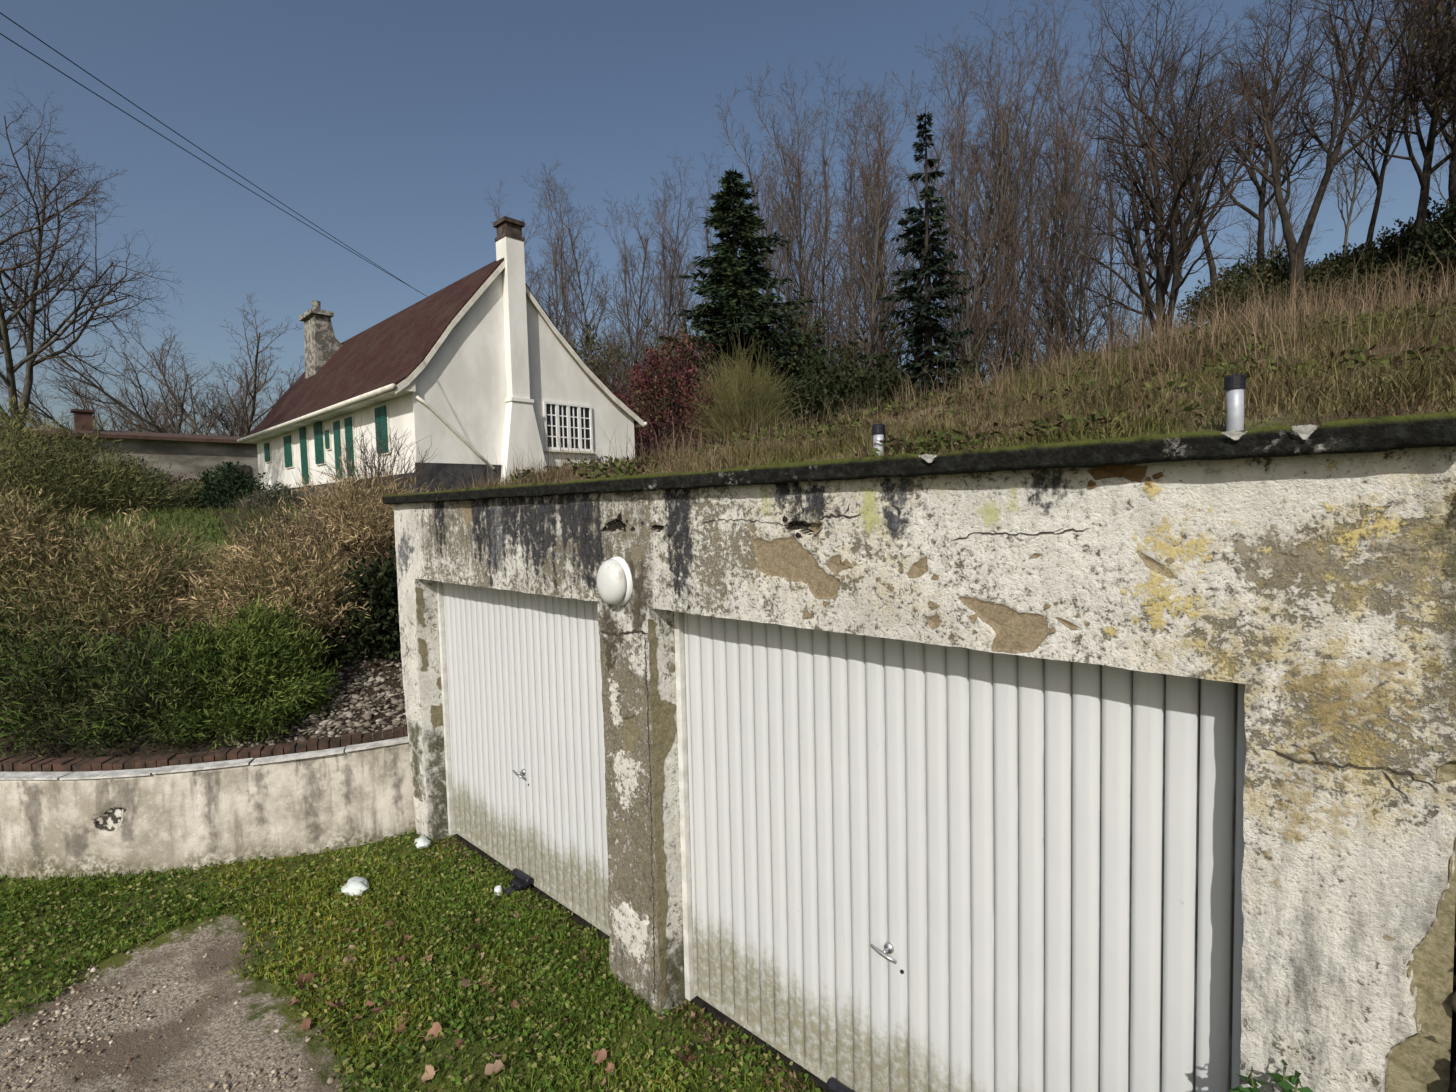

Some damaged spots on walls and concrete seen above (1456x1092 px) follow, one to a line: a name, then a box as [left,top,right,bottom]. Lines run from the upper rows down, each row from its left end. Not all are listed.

damp [471,493,652,669]
damp [664,489,696,611]
peeling [747,508,857,629]
peeling [886,543,939,591]
peeling [926,600,941,629]
peeling [958,596,1090,653]
damp [407,722,449,839]
crack [1263,744,1437,801]
hole [92,807,124,831]
damp [660,934,688,1008]
flaking render [1385,840,1456,1092]